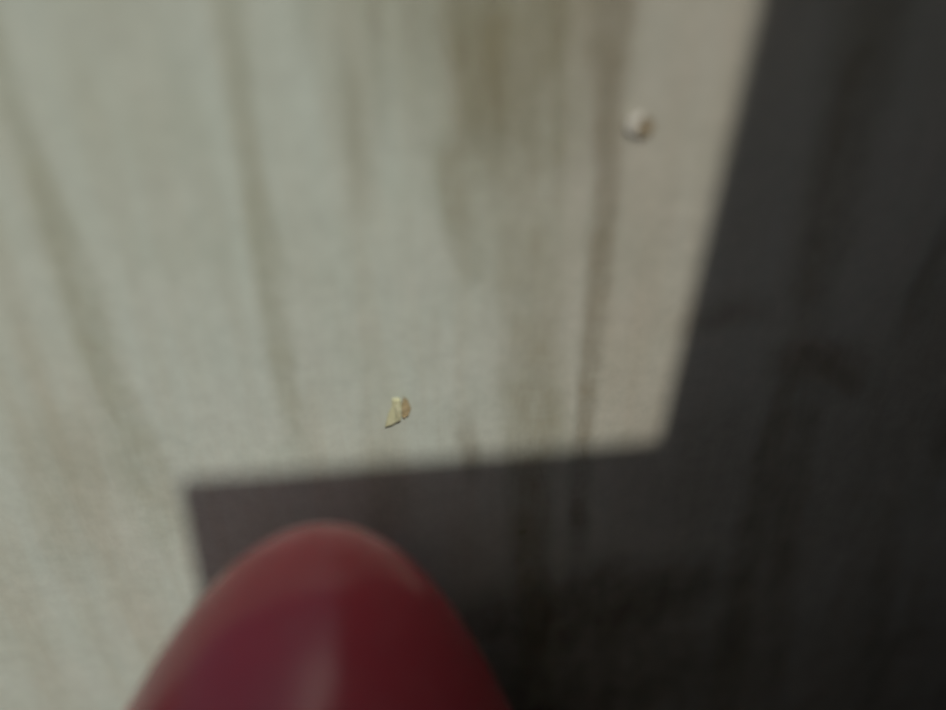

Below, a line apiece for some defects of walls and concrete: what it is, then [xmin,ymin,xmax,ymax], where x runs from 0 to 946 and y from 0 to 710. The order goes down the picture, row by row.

peeling [385,396,411,427]